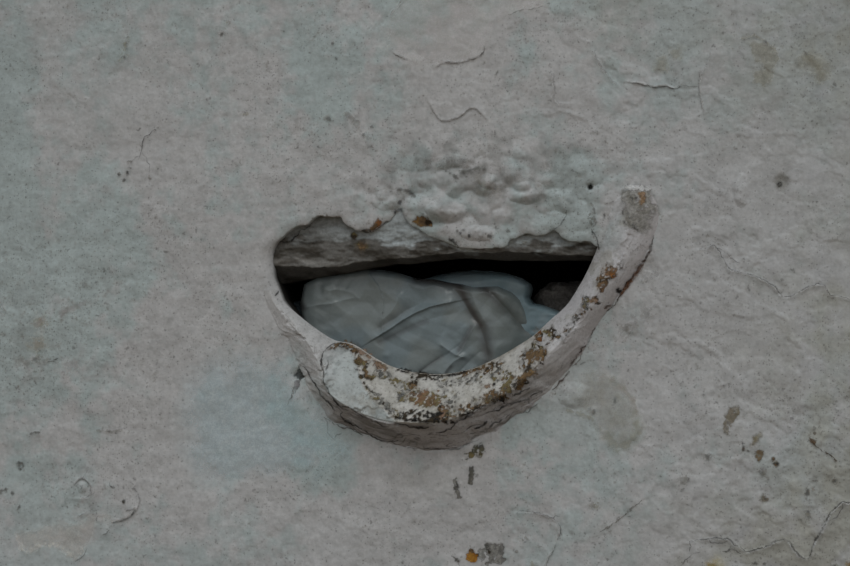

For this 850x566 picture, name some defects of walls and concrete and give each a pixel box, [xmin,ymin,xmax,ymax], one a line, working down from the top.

flaking render [621,184,658,232]
peeling [330,264,622,420]
crack [684,501,850,562]